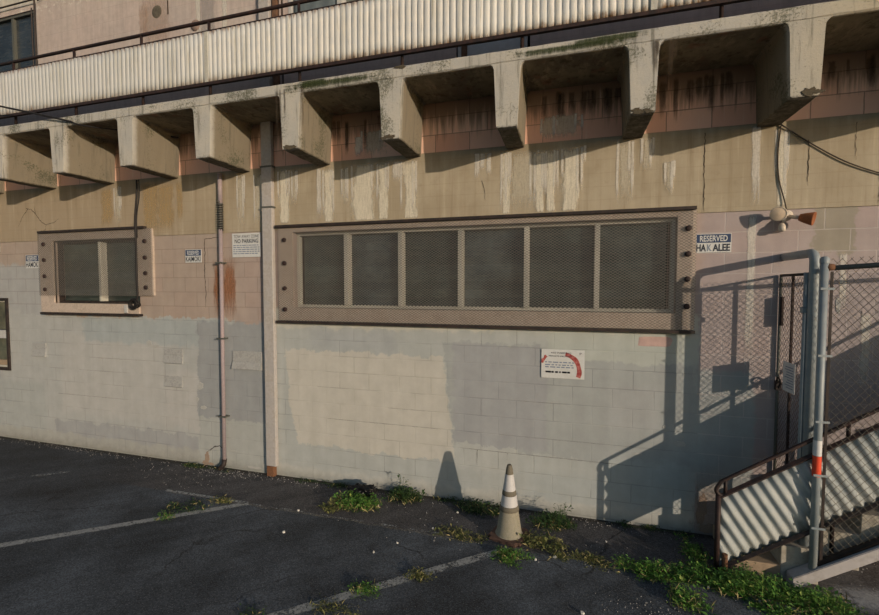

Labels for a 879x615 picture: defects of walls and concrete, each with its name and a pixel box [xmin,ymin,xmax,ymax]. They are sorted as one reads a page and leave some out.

damp [277,170,298,223]
damp [317,161,418,222]
damp [475,145,586,214]
damp [616,137,655,193]
damp [664,161,676,188]
rust [214,267,235,303]